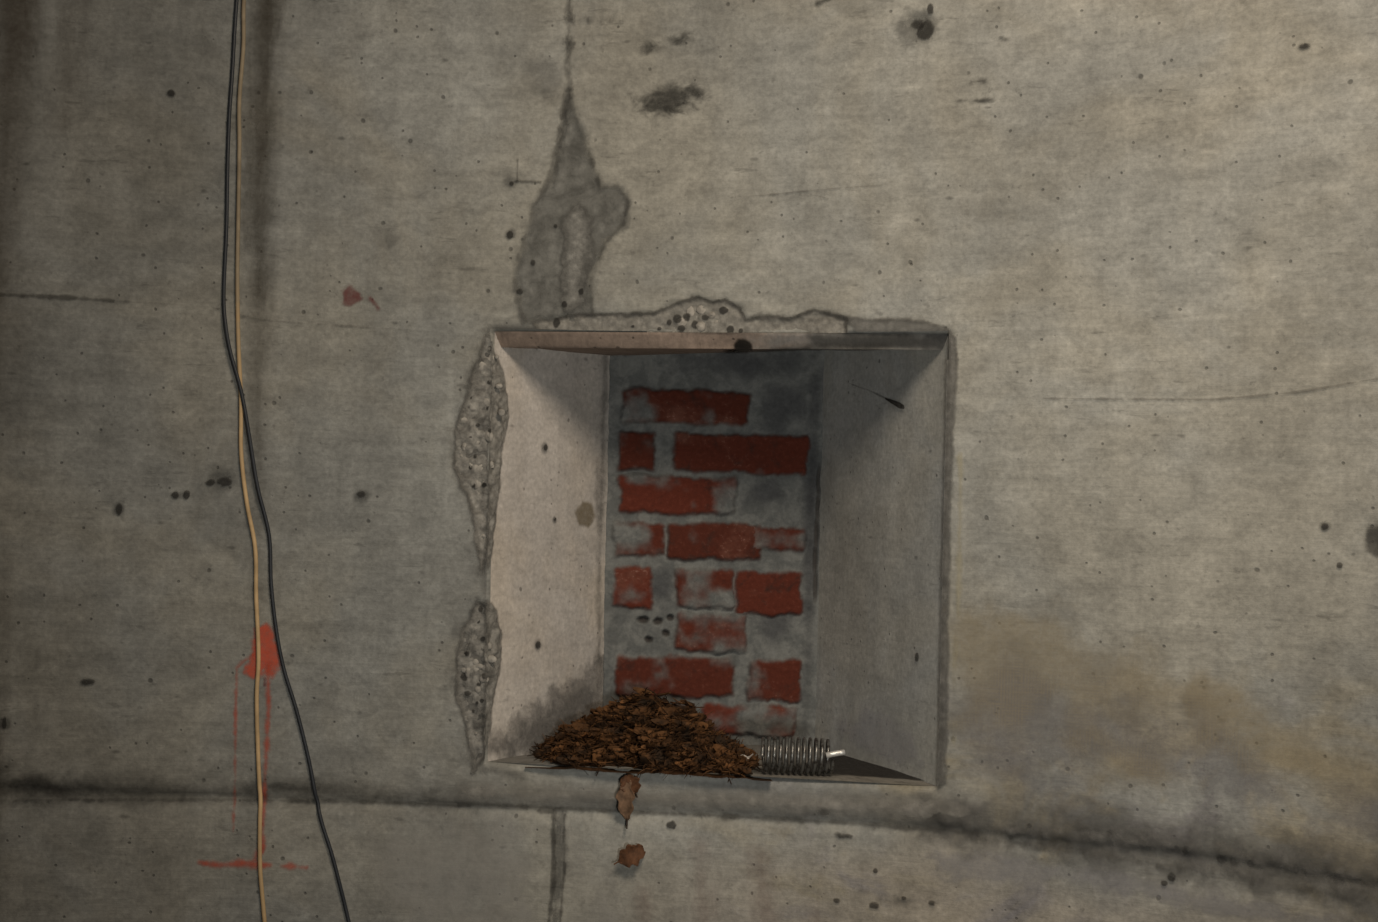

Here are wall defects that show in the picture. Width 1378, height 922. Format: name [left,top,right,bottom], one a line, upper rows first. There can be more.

spalling [454,335,509,569]
peeling [507,96,957,787]
spalling [455,601,502,773]